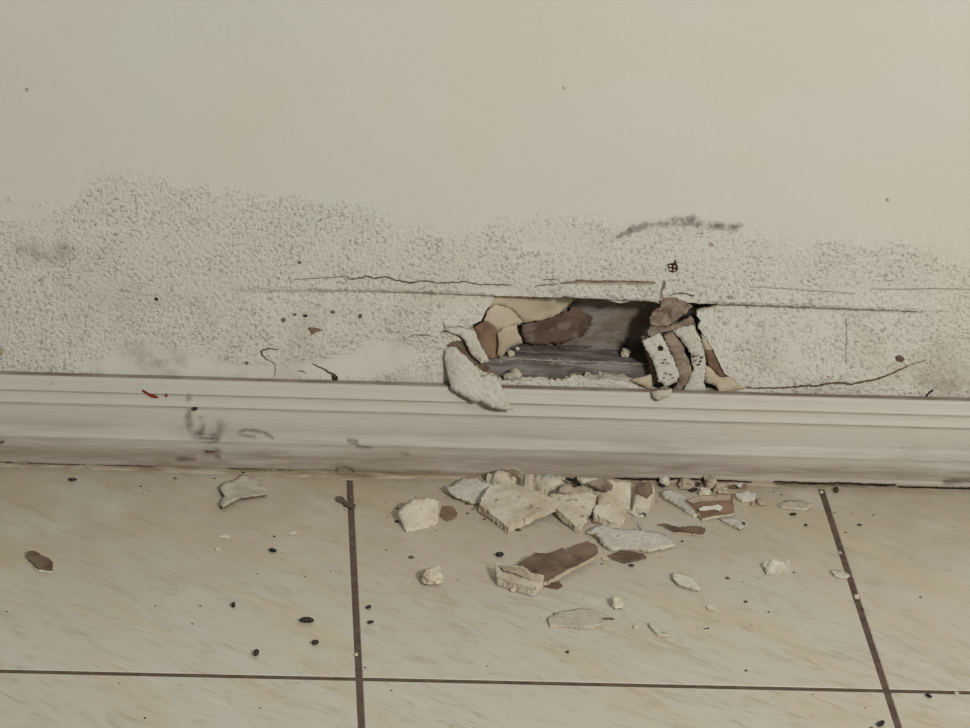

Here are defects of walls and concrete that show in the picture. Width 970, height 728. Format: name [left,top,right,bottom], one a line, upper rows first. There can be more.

crack [294,275,511,286]
spalling [444,295,744,410]
crack [722,286,970,389]